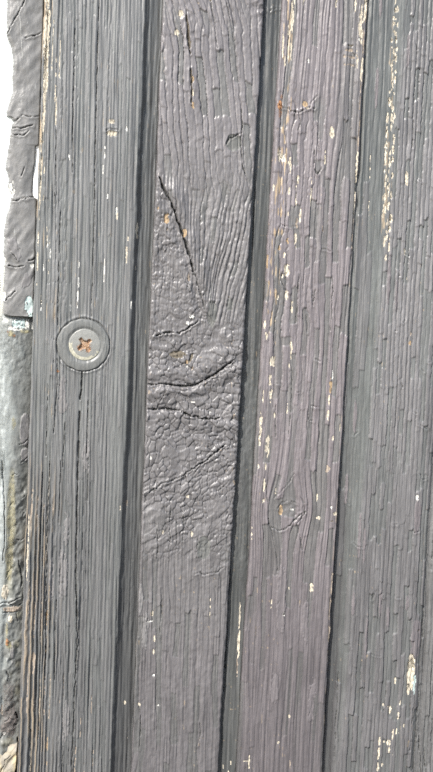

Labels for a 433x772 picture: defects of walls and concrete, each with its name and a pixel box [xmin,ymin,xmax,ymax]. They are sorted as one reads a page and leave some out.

peeling [282,0,304,66]
peeling [343,0,367,110]
crack [9,170,33,201]
crack [54,29,75,322]
crack [91,4,100,316]
crack [156,178,205,336]
peeling [277,147,301,278]
peeling [381,0,411,310]
crack [148,356,234,420]
crack [151,446,223,491]
peeling [258,411,270,503]
peeling [377,701,404,771]